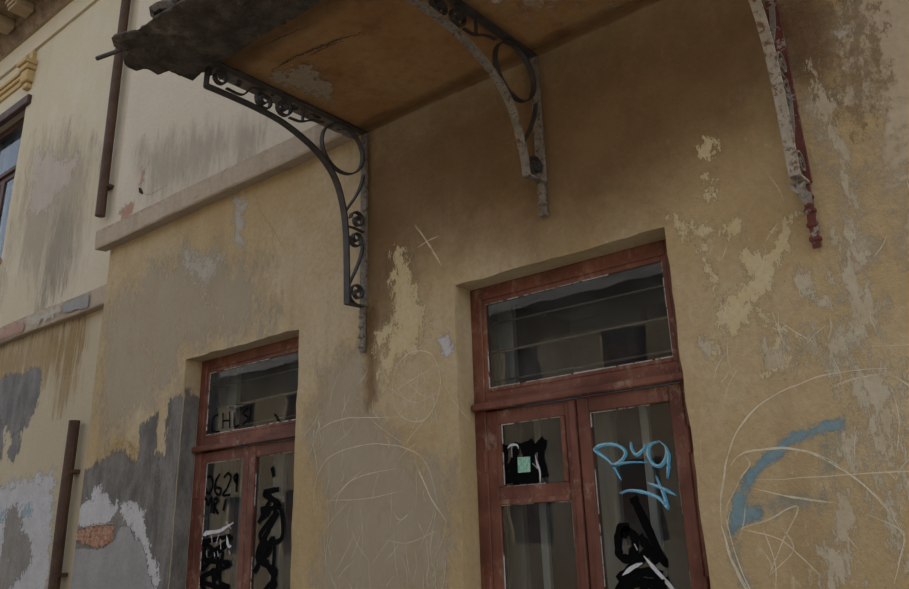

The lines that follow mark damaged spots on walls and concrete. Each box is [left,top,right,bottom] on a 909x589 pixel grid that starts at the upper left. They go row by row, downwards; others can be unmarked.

damp [781,4,827,82]
peeling [371,242,456,395]
peeling [665,57,909,589]
peeling [0,465,58,589]
peeling [75,483,160,589]